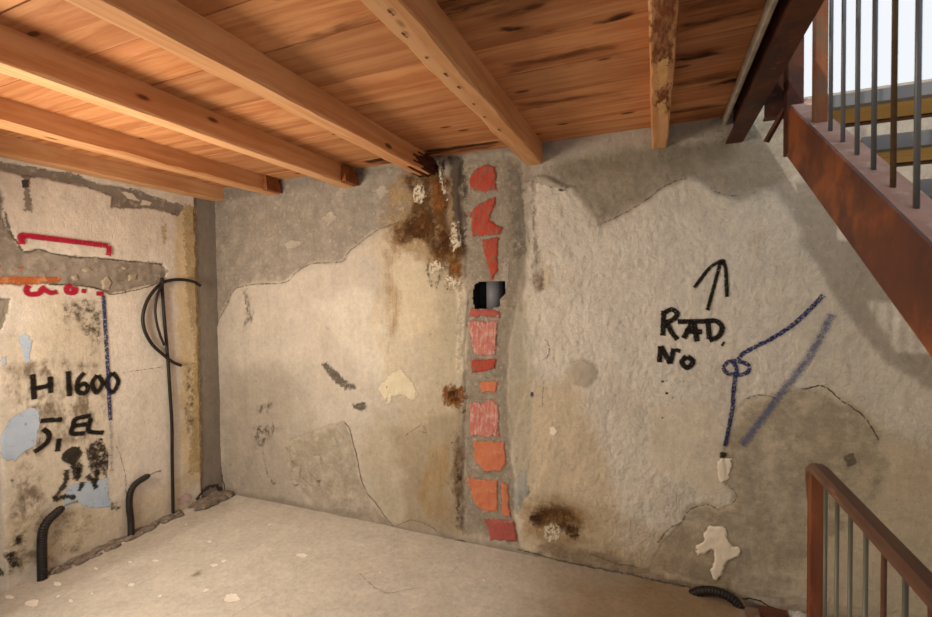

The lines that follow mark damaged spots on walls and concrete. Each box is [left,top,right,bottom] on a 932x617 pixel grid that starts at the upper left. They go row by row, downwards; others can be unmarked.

damp [595,13,632,24]
damp [649,0,717,66]
damp [654,71,740,118]
corrosion [388,158,464,292]
spalling [0,161,203,475]
corrosion [439,383,468,413]
damp [75,432,109,478]
peeling [64,478,112,508]
corrosion [526,501,584,543]